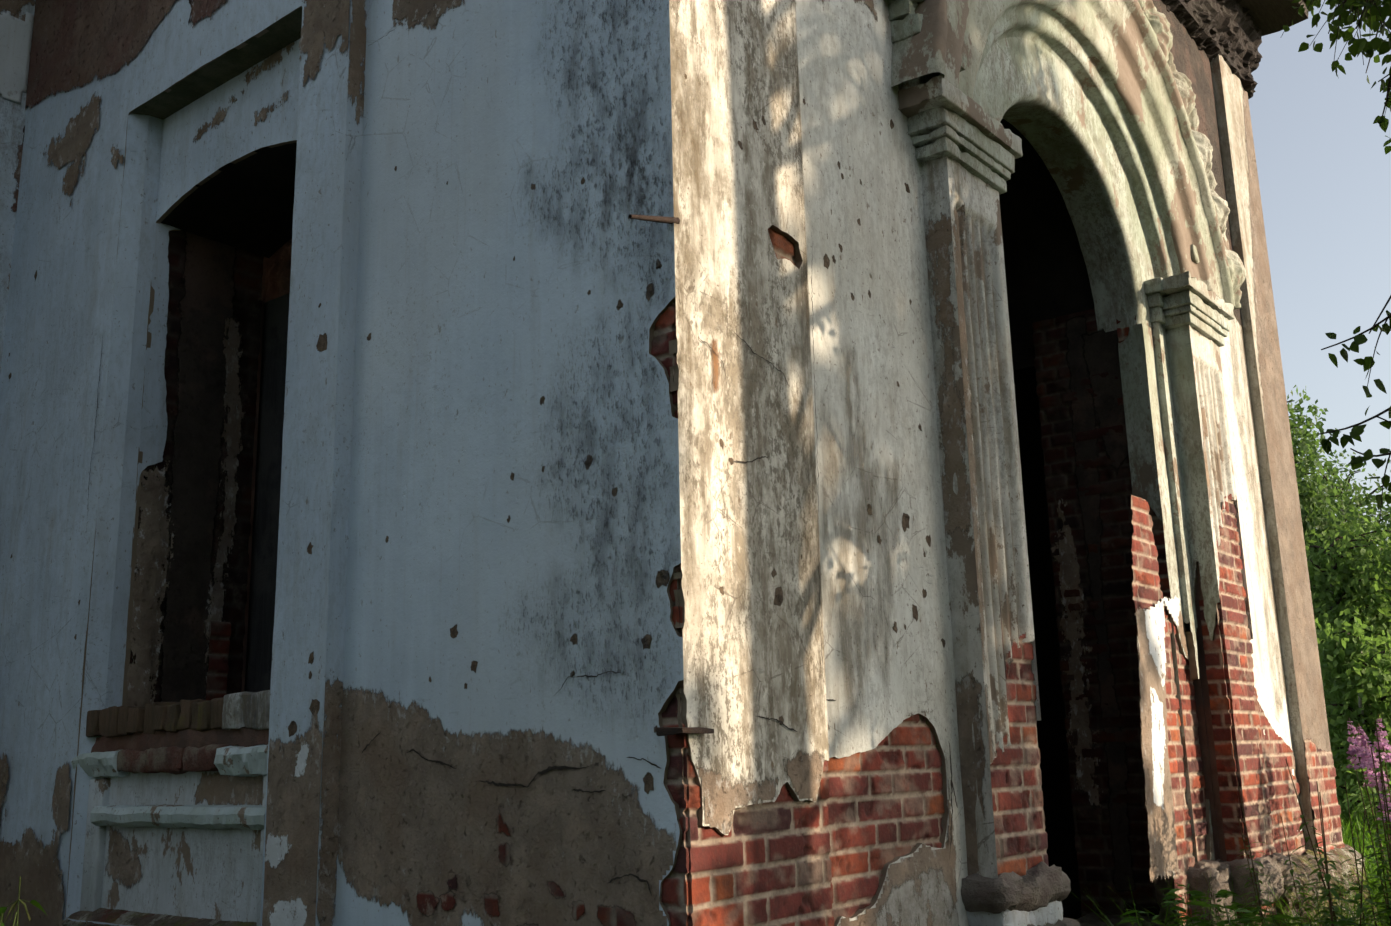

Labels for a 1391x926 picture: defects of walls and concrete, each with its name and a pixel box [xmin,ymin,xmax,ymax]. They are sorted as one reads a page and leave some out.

flaking render [0,0,228,212]
flaking render [193,0,367,144]
flaking render [392,0,465,30]
water stain [533,0,665,299]
flaking render [1152,0,1233,251]
water stain [524,582,663,702]
water stain [550,321,668,566]
flaking render [194,203,1049,926]
flaking render [1131,88,1345,925]
flaking render [0,753,71,926]